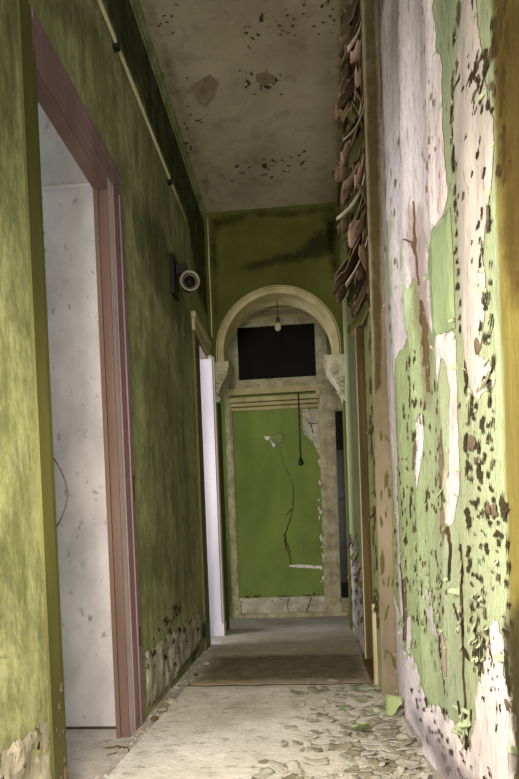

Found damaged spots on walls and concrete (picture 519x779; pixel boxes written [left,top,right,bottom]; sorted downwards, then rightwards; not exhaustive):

peeling [183,75,219,129]
peeling [311,0,370,337]
peeling [264,433,283,447]
peeling [301,408,320,465]
peeling [346,0,516,779]
crack [280,452,294,569]
flaking render [144,605,206,708]
flaking render [0,722,68,779]